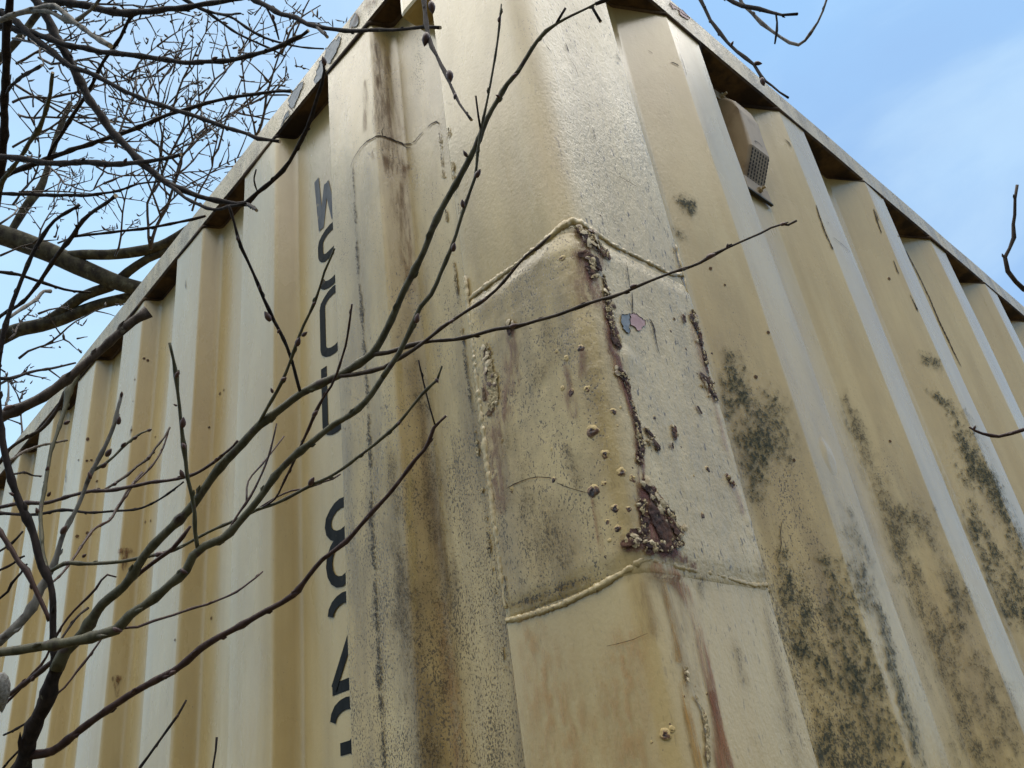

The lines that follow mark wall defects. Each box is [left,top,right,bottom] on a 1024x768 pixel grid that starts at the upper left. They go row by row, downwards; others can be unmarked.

crack [351,121,438,164]
peeling [621,312,646,333]
water stain [352,168,386,767]
rust [558,224,697,661]
water stain [721,350,797,502]
water stain [843,395,872,470]
water stain [926,388,1024,631]
water stain [392,545,421,647]
rust [650,694,703,768]
rust [695,640,734,768]
water stain [772,508,926,768]
water stain [874,478,1018,768]